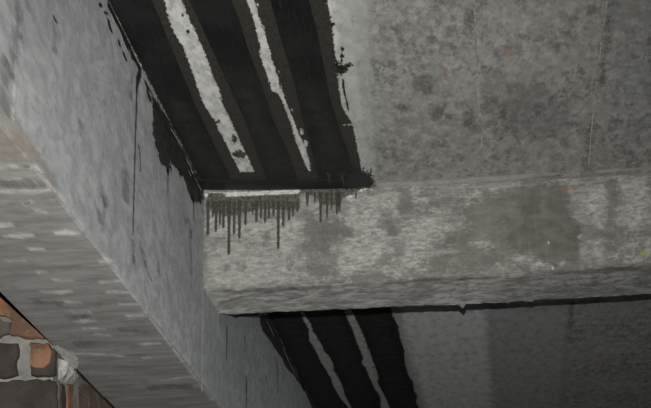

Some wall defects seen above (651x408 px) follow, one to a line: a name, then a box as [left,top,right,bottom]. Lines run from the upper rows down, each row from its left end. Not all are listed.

water stain [99,2,140,68]
water stain [144,80,651,285]